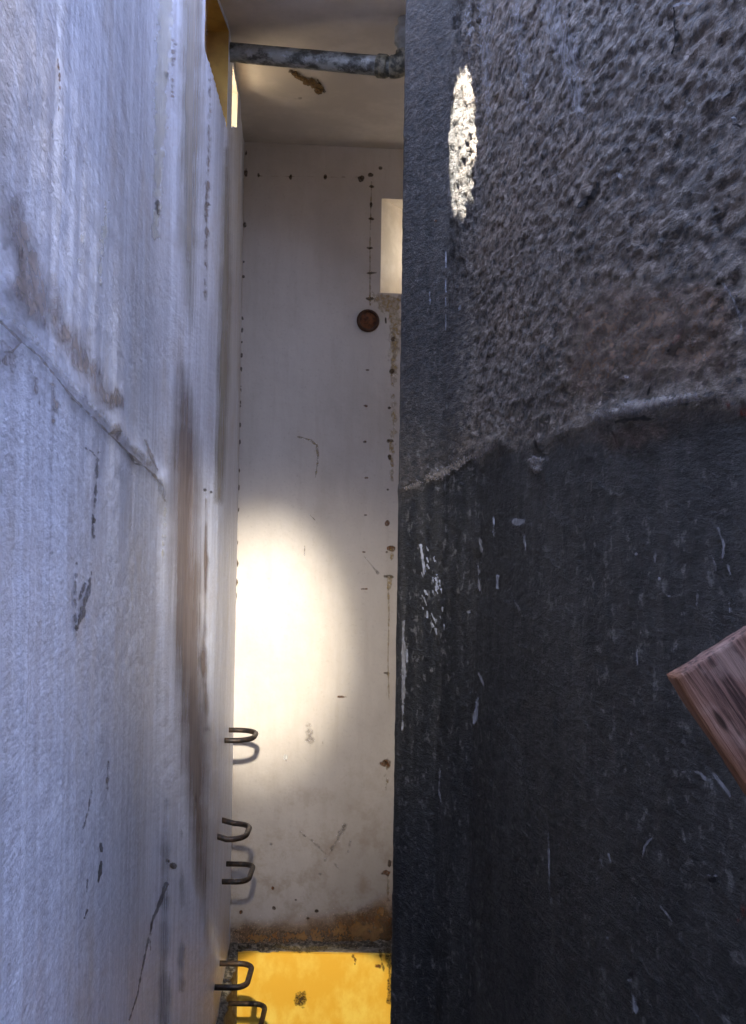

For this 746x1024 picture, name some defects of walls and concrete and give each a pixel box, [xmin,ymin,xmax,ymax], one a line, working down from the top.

water stain [174,390,208,889]
crack [129,882,169,1020]
rust [230,860,392,944]